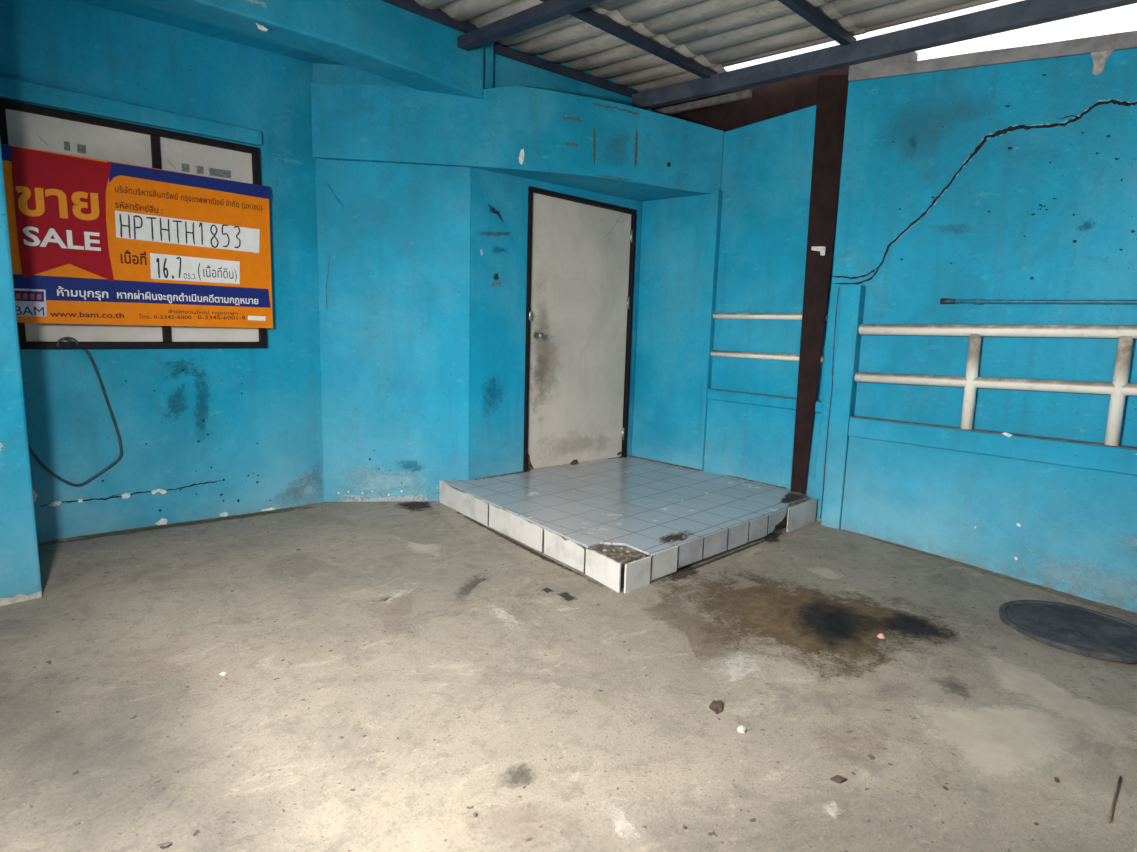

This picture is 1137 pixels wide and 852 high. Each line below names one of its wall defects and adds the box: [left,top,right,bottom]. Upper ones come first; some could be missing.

crack [831,99,1137,284]
crack [40,480,222,507]